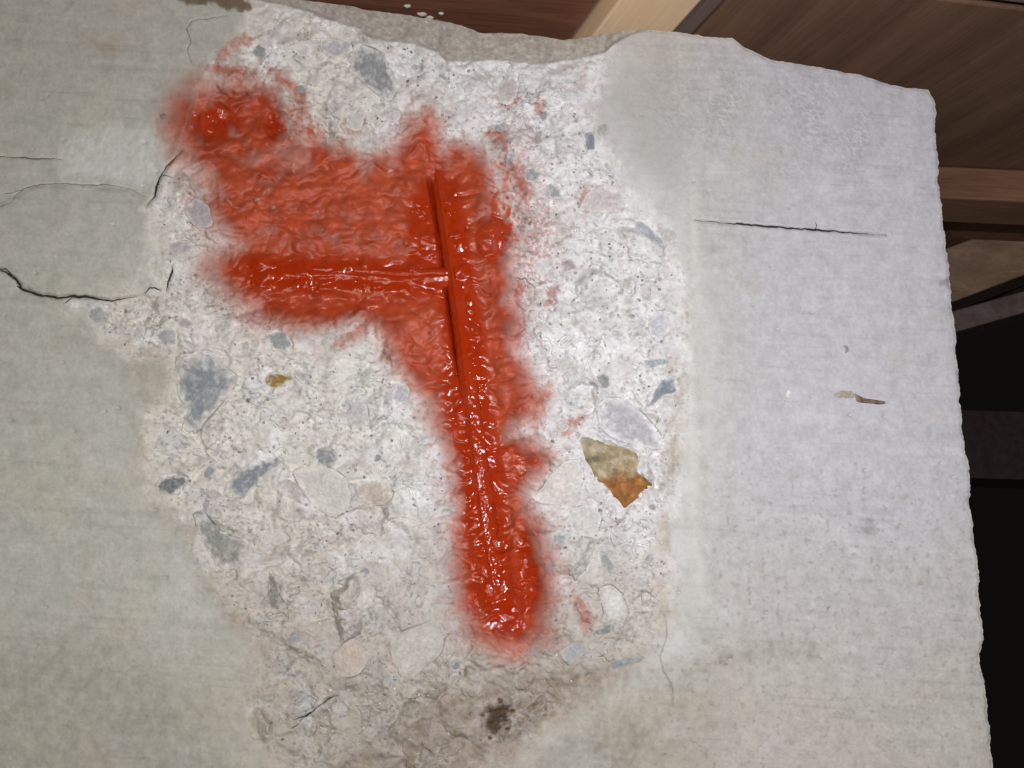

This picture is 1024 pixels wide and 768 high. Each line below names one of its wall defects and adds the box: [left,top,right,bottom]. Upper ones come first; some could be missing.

crack [0,154,179,206]
crack [698,220,887,236]
crack [0,264,173,303]
spalling [74,0,691,768]